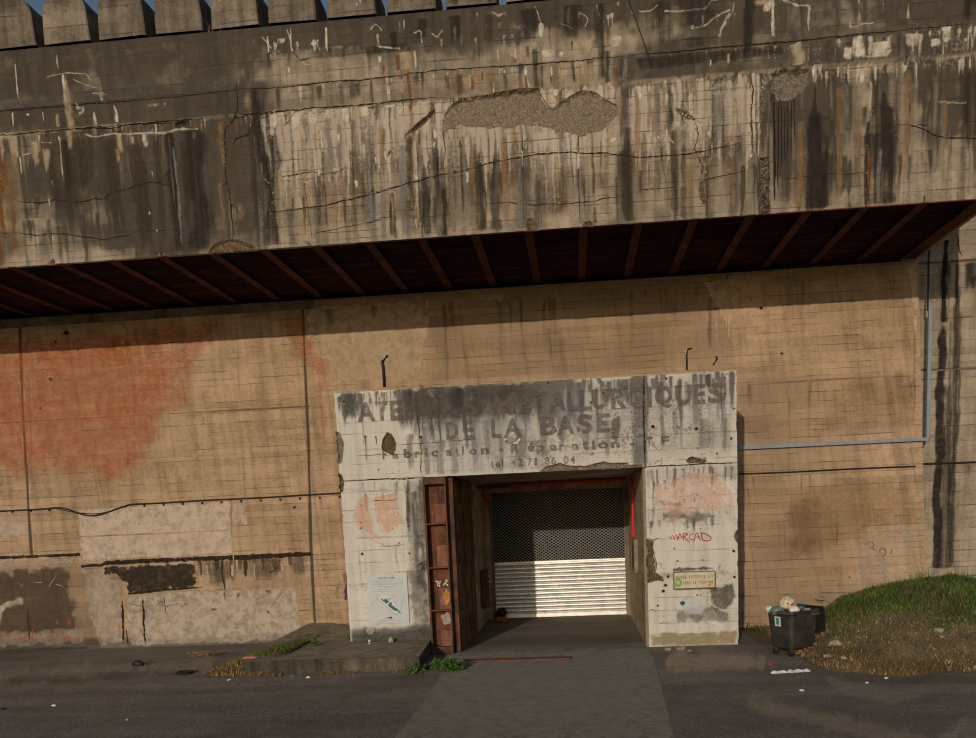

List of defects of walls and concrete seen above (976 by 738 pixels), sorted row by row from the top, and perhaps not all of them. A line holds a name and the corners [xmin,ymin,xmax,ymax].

damp [0,59,209,248]
damp [248,82,369,243]
crack [0,23,976,238]
spalling [404,87,618,137]
damp [610,0,811,220]
spalling [747,76,770,214]
spalling [771,69,810,101]
damp [843,13,907,72]
crack [3,230,177,240]
spalling [364,432,397,455]
damp [932,240,960,568]
spalling [646,538,670,593]